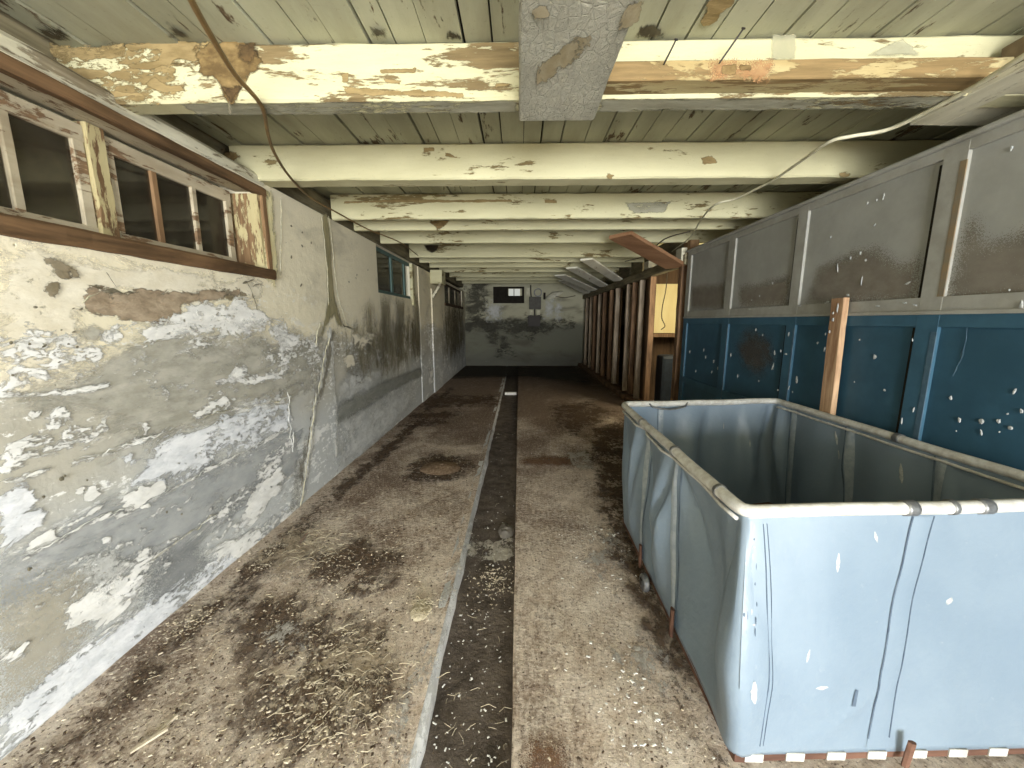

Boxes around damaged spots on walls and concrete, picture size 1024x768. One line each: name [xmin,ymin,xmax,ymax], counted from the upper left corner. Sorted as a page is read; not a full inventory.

peeling [49,41,517,115]
peeling [536,35,592,85]
peeling [599,96,963,112]
peeling [627,202,670,213]
crack [290,214,354,512]
water stain [334,294,431,426]
peeling [0,257,324,602]
water stain [439,283,707,715]
water stain [687,737,729,767]